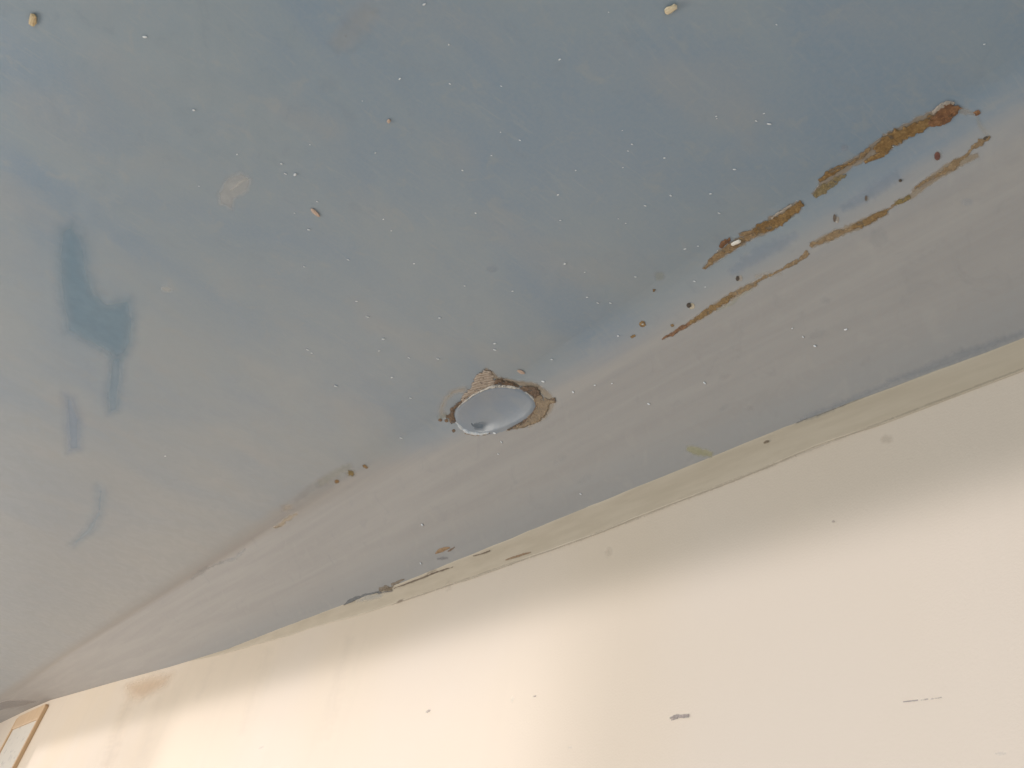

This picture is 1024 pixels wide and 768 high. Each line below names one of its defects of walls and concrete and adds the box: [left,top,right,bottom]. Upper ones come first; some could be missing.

leakage [60,227,132,412]
peeling [438,368,556,436]
peeling [662,136,991,340]
peeling [702,103,981,269]